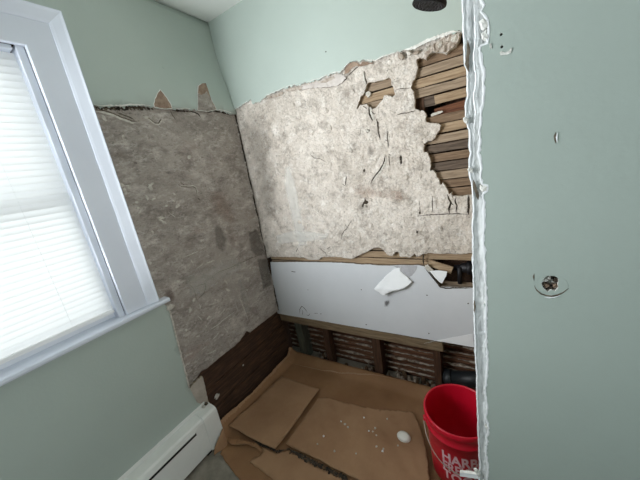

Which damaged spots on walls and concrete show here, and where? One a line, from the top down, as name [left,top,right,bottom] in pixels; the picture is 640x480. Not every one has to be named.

flaking render [94,0,492,480]
spalling [543,276,558,290]